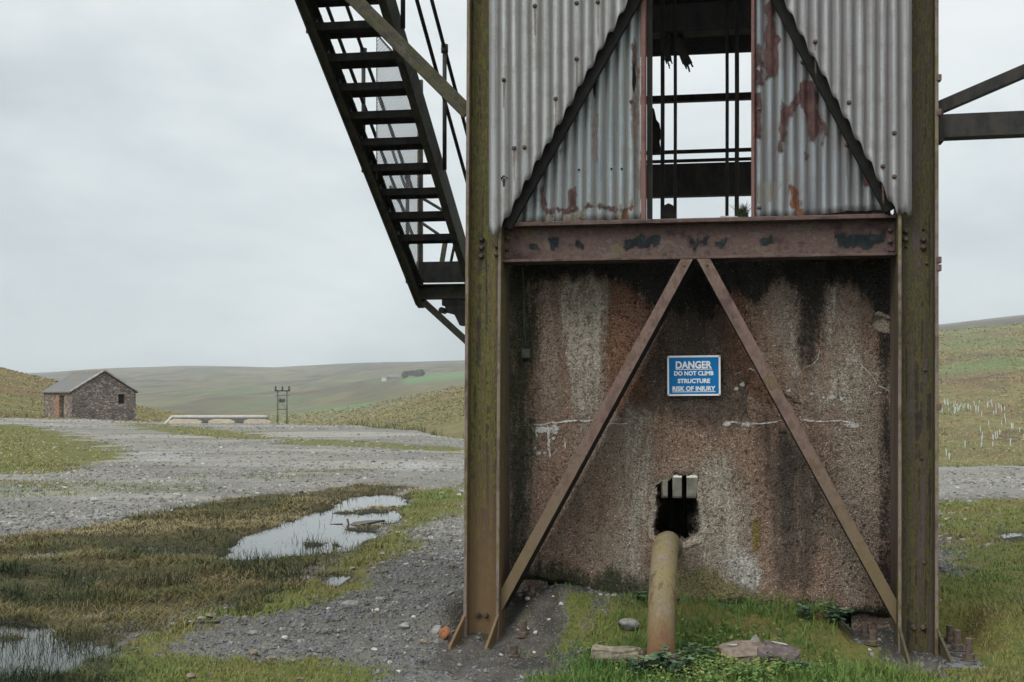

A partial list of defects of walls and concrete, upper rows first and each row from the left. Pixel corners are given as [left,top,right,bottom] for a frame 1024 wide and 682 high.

corrosion [755,1,781,138]
corrosion [778,80,828,160]
corrosion [540,186,634,221]
peeling [623,233,661,251]
corrosion [788,184,803,216]
peeling [835,232,886,249]
water stain [510,262,679,457]
water stain [611,259,890,592]
spalling [647,471,674,540]
spalling [682,471,709,549]